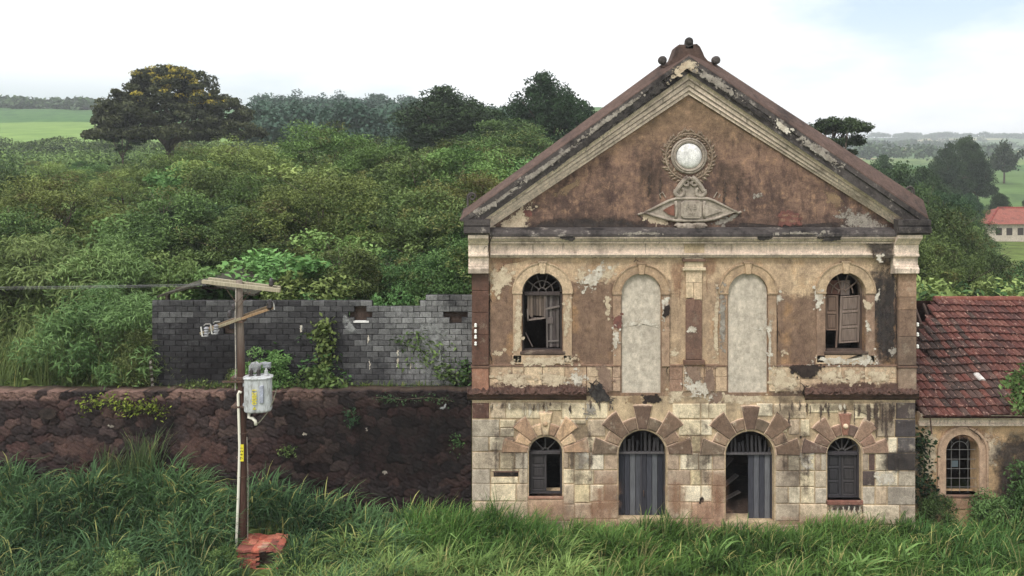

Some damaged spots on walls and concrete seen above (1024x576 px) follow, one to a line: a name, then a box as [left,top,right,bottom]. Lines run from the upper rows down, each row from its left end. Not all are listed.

peeling [667,60,746,103]
peeling [776,118,845,172]
peeling [489,260,624,393]
peeling [625,282,897,405]
leakage [581,377,617,411]
leakage [777,400,917,470]